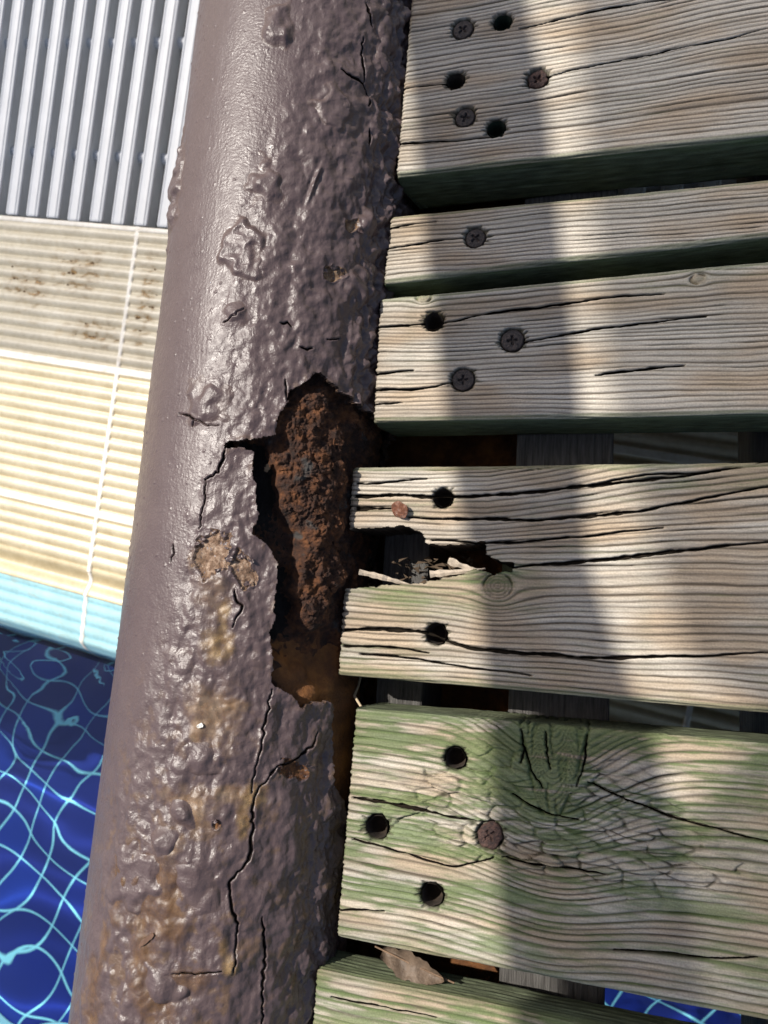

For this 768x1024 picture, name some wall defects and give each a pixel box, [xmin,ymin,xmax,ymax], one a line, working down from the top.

crack [341,3,373,145]
crack [178,413,226,527]
crack [173,689,318,1024]